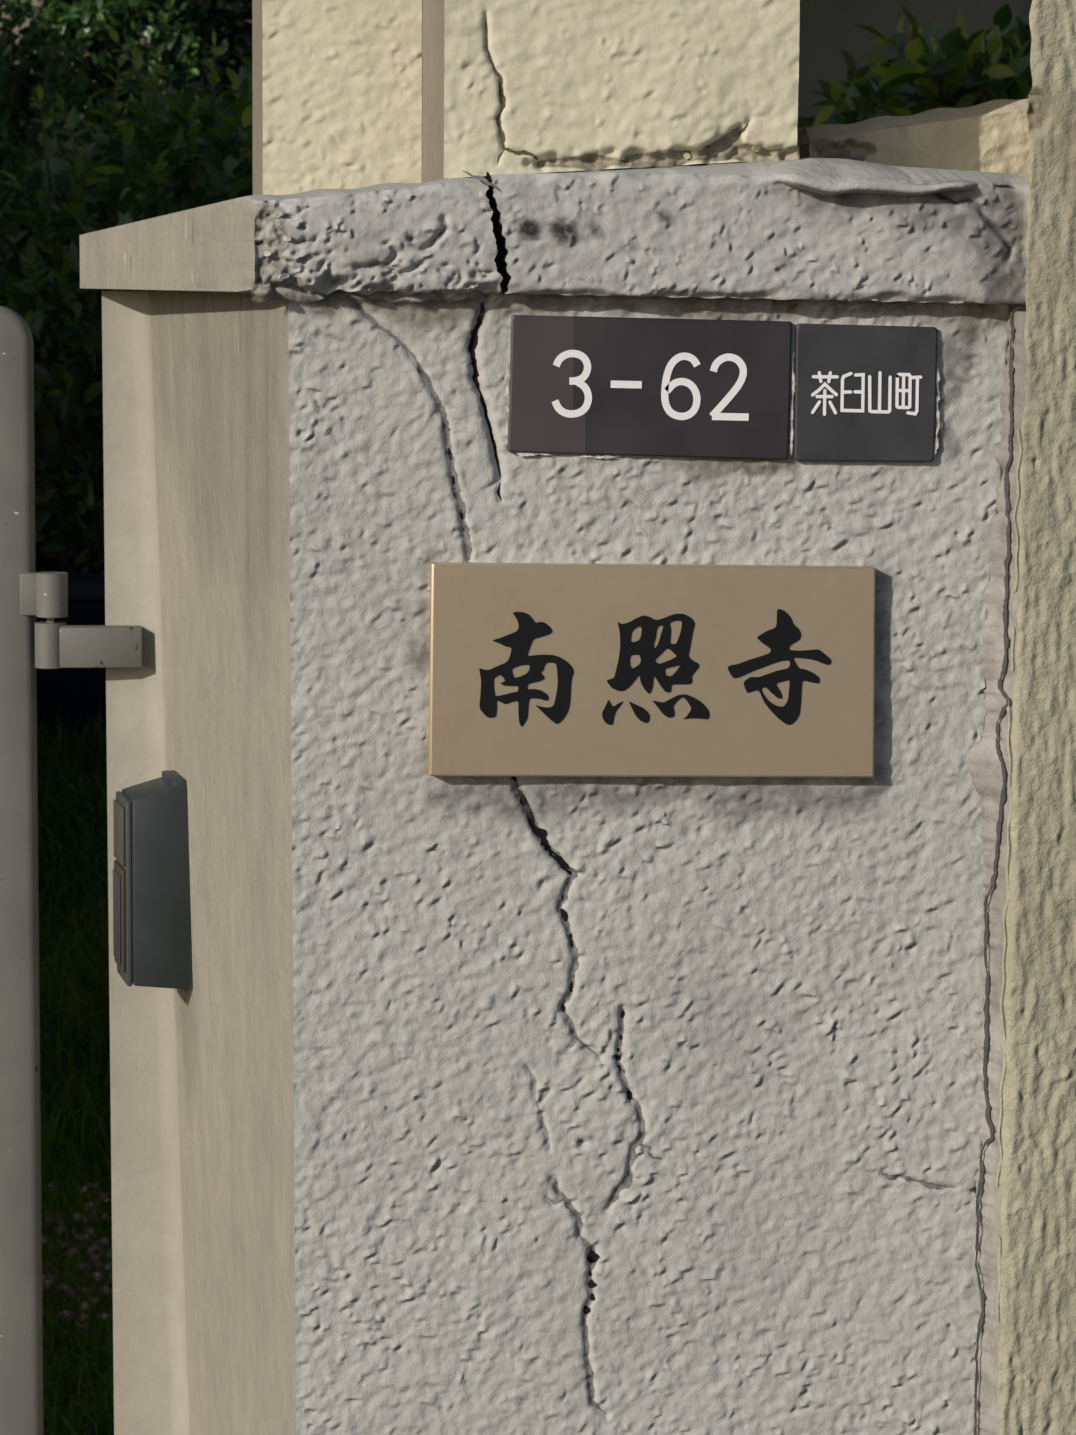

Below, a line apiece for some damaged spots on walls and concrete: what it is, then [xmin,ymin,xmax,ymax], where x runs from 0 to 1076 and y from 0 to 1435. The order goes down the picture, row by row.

crack [351,220,472,560]
crack [462,20,541,500]
crack [511,776,662,1415]
crack [882,308,1019,1435]